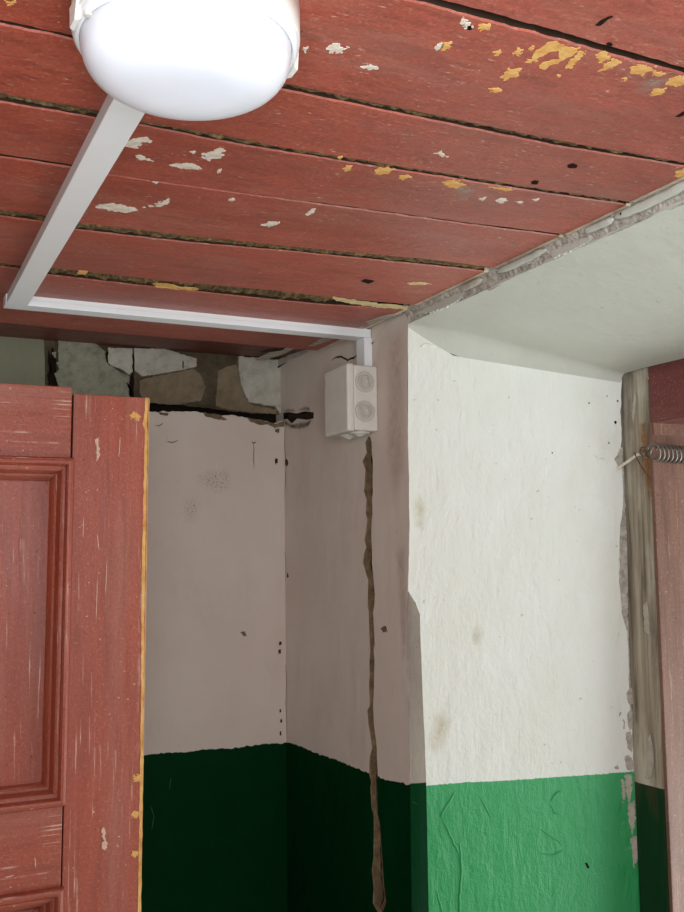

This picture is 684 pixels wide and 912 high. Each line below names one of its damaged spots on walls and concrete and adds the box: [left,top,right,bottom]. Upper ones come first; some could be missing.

peeling [460,17,491,31]
peeling [434,41,452,51]
peeling [488,41,684,96]
peeling [125,137,154,162]
peeling [166,148,226,173]
peeling [374,166,412,180]
peeling [95,198,170,213]
flaking render [332,169,684,329]
flaking render [107,338,333,433]
flaking render [614,447,638,868]
crack [363,437,386,912]